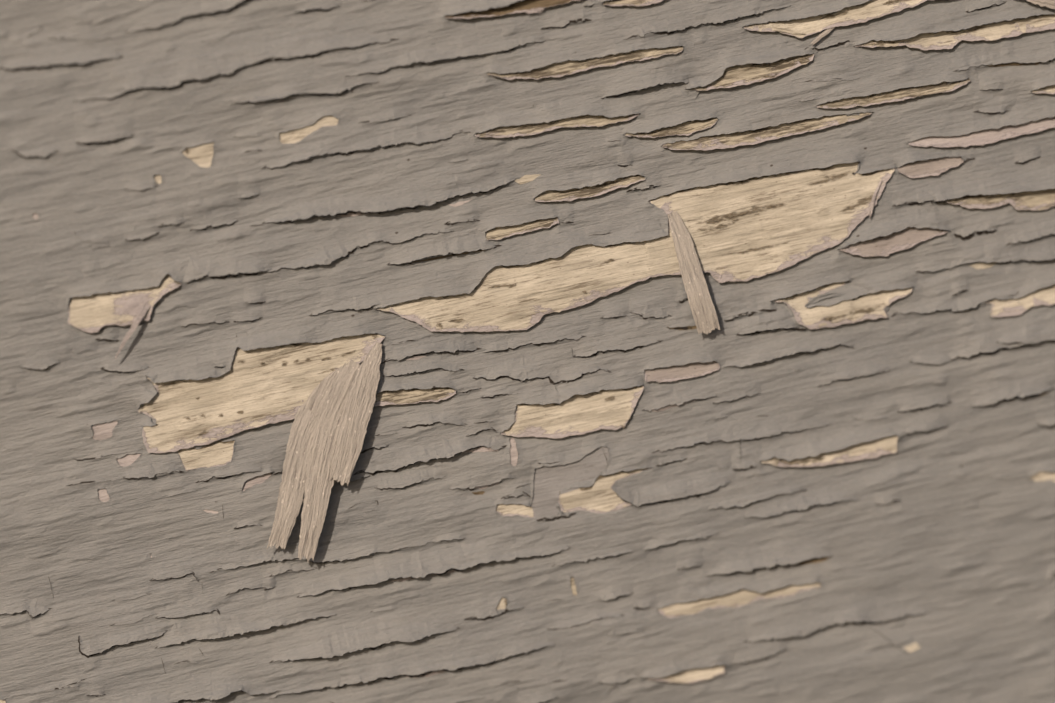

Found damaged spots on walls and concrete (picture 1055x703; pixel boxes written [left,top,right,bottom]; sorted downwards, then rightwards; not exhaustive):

peeling [52,247,271,359]
peeling [85,0,1055,562]
peeling [650,563,832,621]